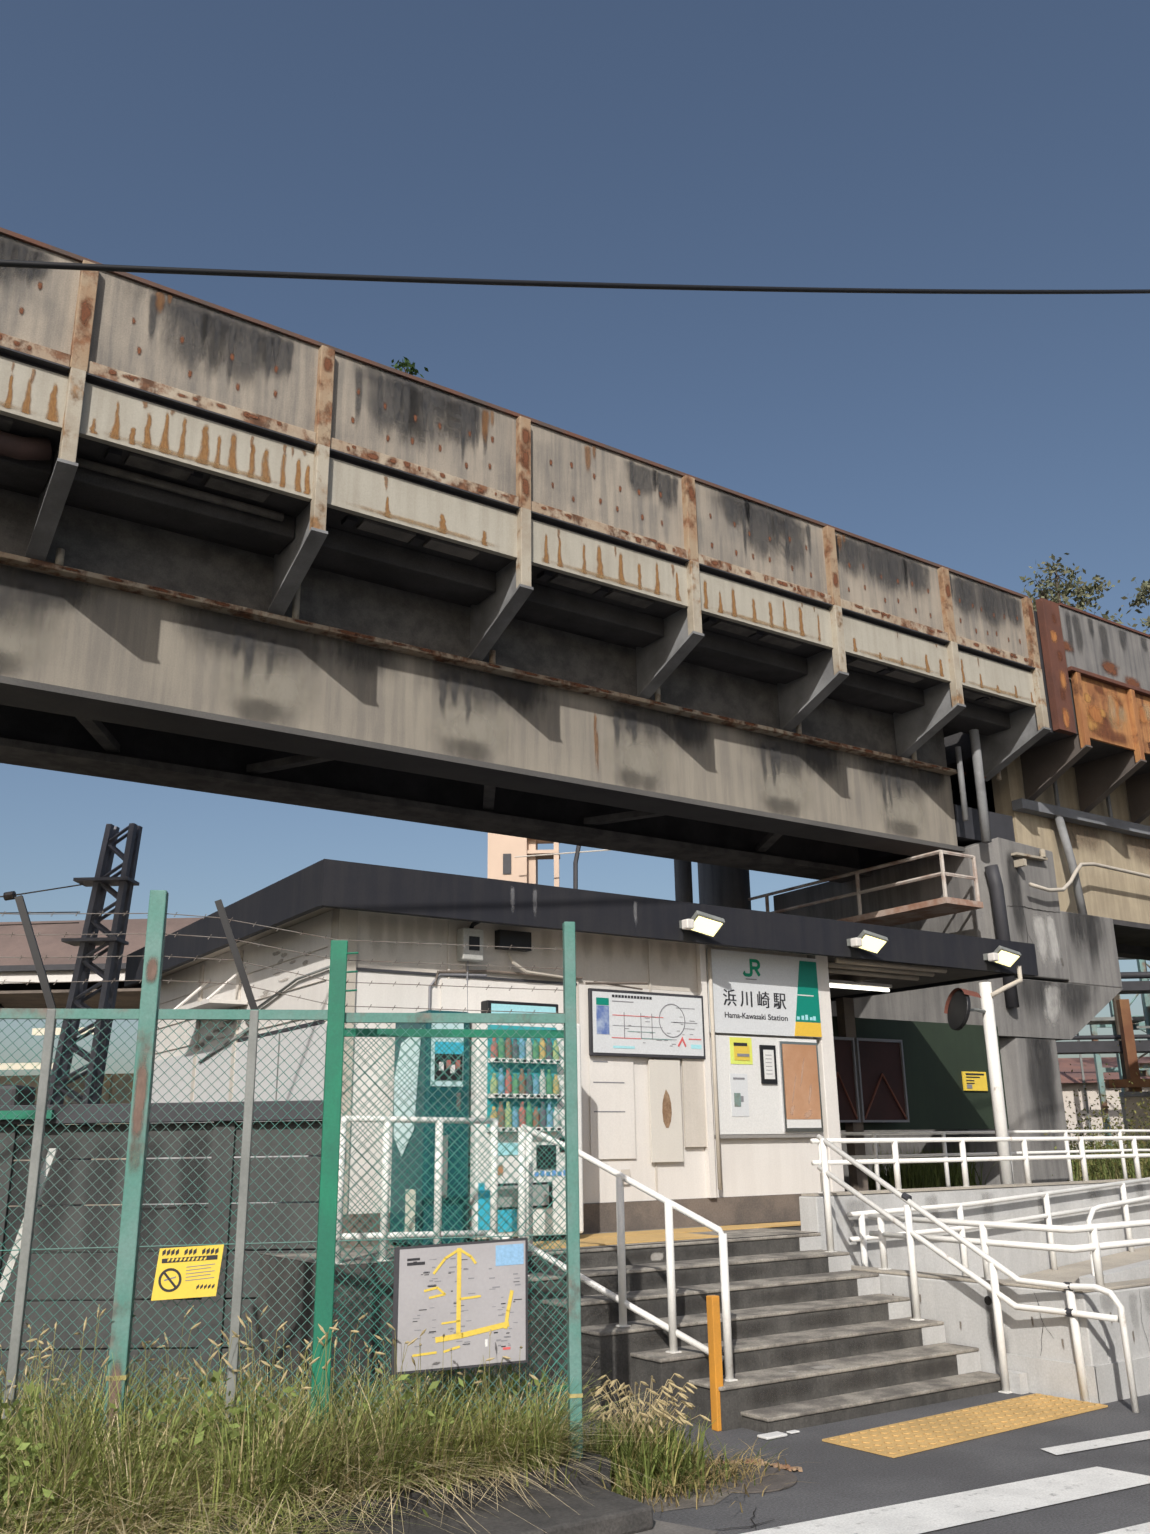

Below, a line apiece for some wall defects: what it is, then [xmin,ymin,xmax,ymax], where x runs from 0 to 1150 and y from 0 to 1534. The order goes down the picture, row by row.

leakage [149,294,293,376]
rust [0,334,58,422]
rust [90,393,310,494]
leakage [356,369,487,449]
leakage [629,461,678,505]
leakage [722,491,810,561]
leakage [0,564,88,656]
leakage [190,607,318,709]
leakage [436,661,538,746]
leakage [613,702,707,778]
rust [704,536,1034,703]
rust [1103,662,1140,688]